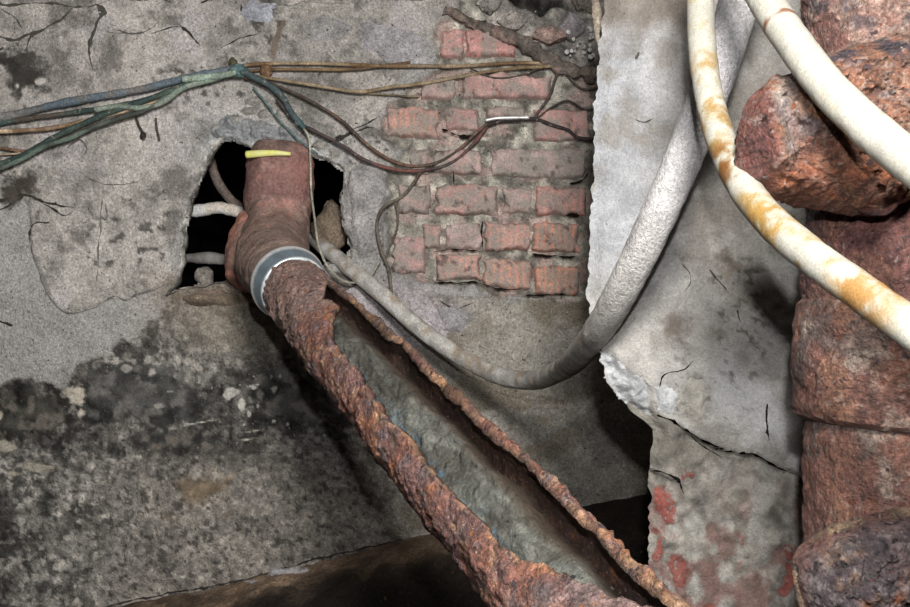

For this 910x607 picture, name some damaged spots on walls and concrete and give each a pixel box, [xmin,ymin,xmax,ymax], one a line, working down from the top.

crack [0,0,257,70]
spalling [531,0,592,47]
crack [0,194,74,242]
crack [67,139,143,291]
spalling [30,96,302,314]
spalling [308,139,353,270]
spalling [387,72,590,296]
leakage [8,462,55,476]
leakage [0,385,65,452]
leakage [81,362,217,459]
leakage [223,359,329,430]
crack [657,404,798,476]